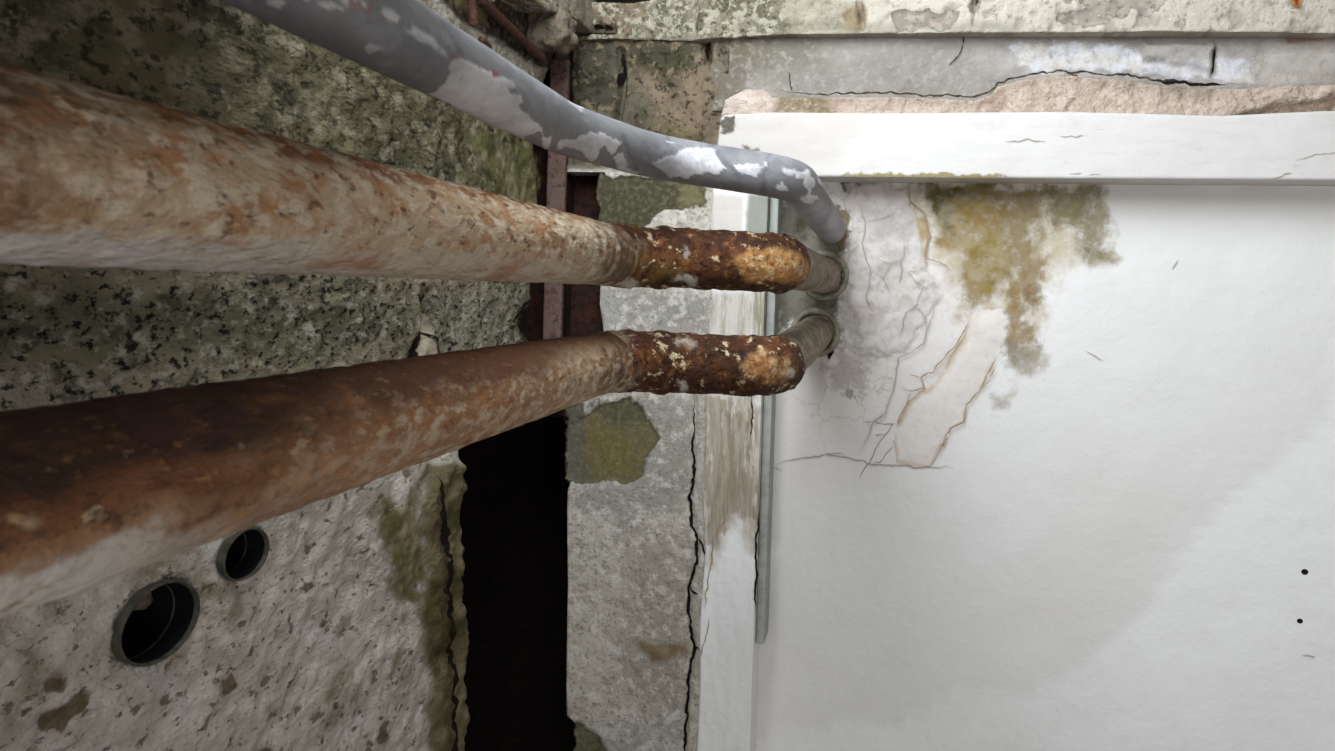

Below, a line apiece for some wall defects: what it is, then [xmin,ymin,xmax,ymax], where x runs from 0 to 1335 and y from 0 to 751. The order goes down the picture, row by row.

peeling [891,0,981,32]
crack [775,37,1245,98]
peeling [1056,0,1164,28]
water stain [1009,40,1258,84]
water stain [778,172,1113,372]
crack [773,187,1003,476]
crack [748,396,756,434]
crack [434,472,459,751]
crack [683,399,725,751]
crack [753,514,761,612]